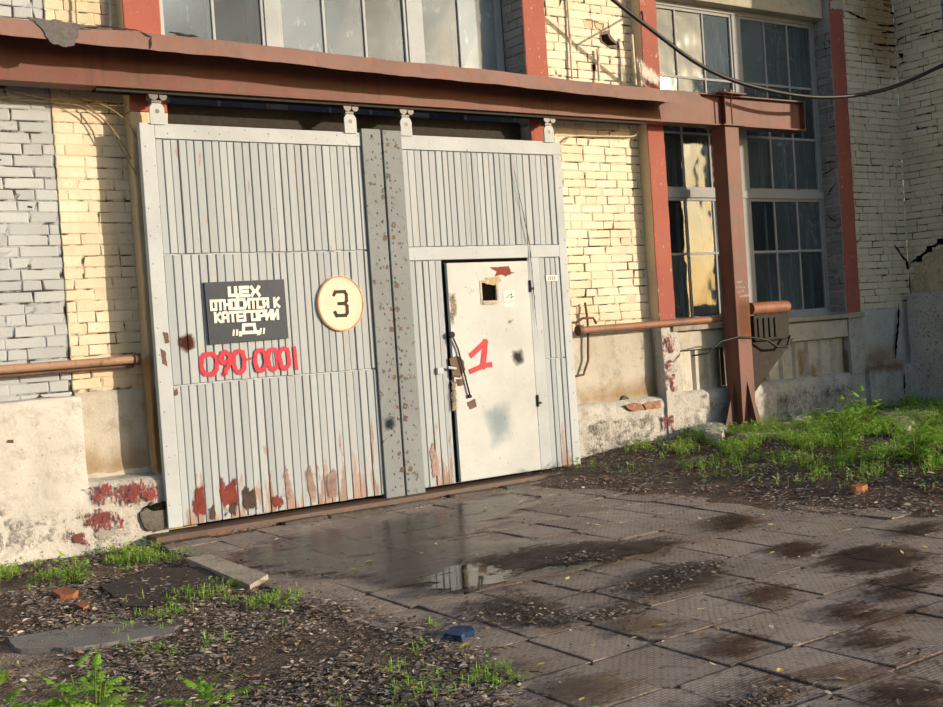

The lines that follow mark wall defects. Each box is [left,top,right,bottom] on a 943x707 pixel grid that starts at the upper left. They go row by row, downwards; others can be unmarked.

peeling [583,16,622,49]
crack [894,238,943,395]